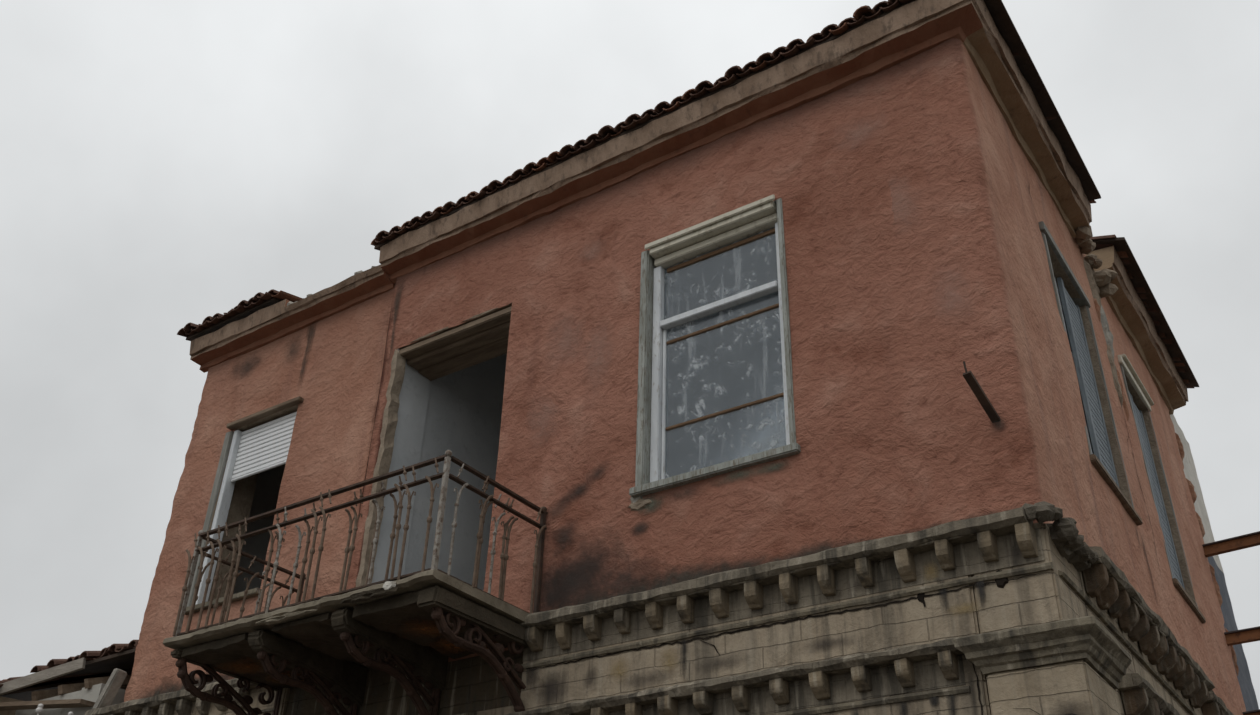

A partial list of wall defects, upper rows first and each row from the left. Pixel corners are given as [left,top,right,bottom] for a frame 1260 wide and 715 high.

leakage [547,545,835,605]
crack [972,664,983,715]